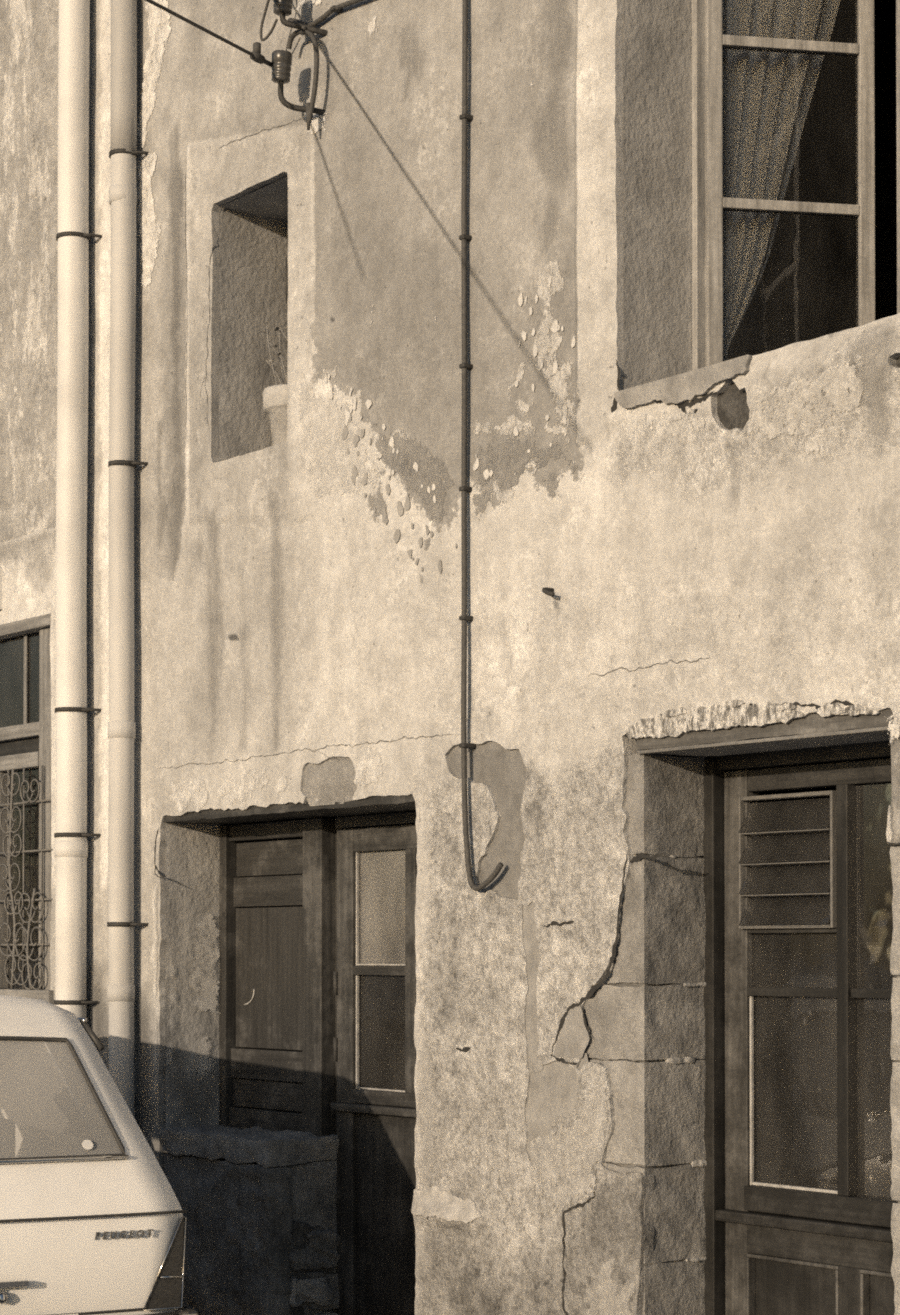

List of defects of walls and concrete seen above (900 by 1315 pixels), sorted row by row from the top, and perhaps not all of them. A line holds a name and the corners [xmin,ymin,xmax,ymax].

peeling [136,0,171,290]
peeling [472,260,577,522]
peeling [636,354,865,455]
peeling [297,366,454,575]
crack [589,658,708,676]
peeling [170,770,287,812]
spalling [303,747,382,806]
spalling [625,699,900,812]
spalling [448,741,589,1073]
crack [562,1169,597,1315]
flaking render [586,1258,634,1315]